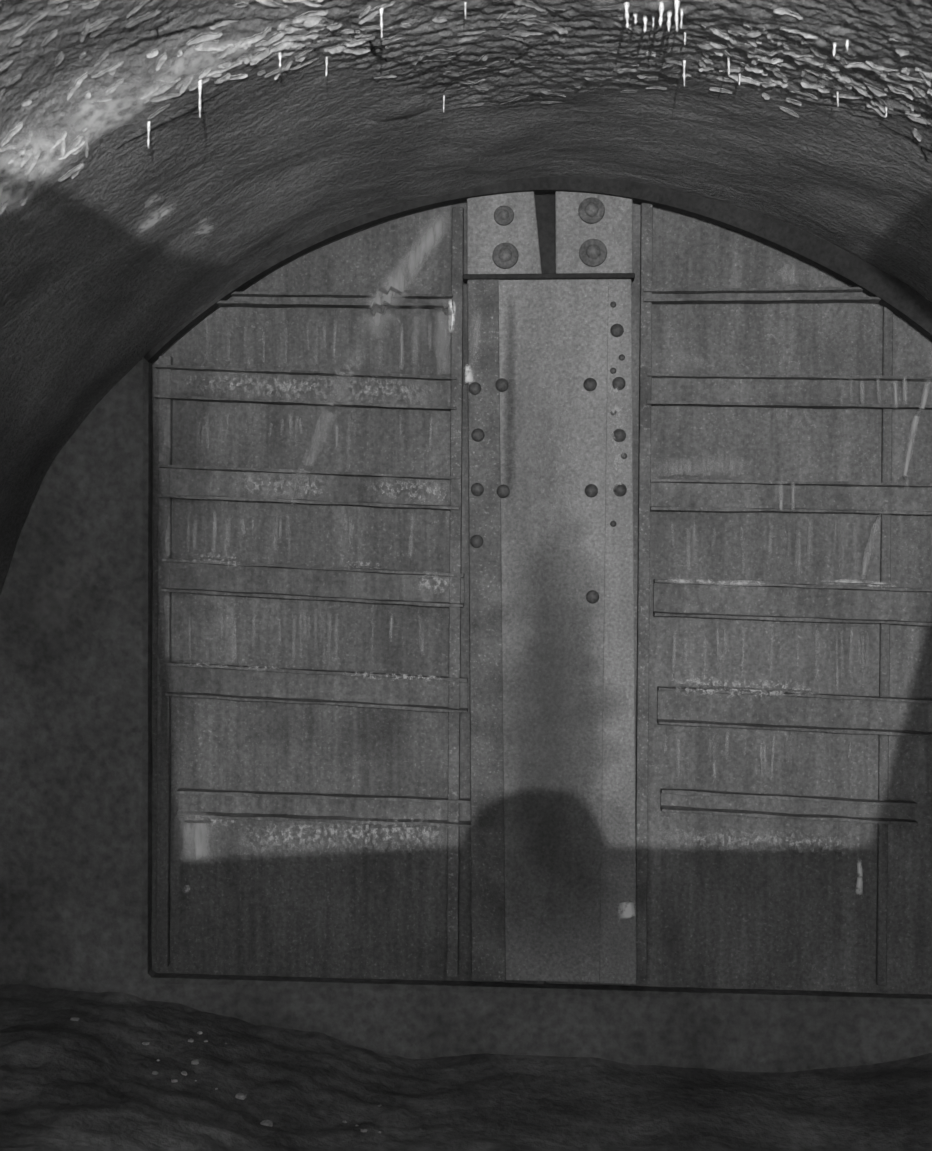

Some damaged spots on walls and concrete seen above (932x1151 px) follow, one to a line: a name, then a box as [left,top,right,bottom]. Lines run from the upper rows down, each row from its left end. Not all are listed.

flaking render [0,0,161,103]
flaking render [139,0,420,119]
flaking render [410,0,932,141]
flaking render [0,122,91,214]